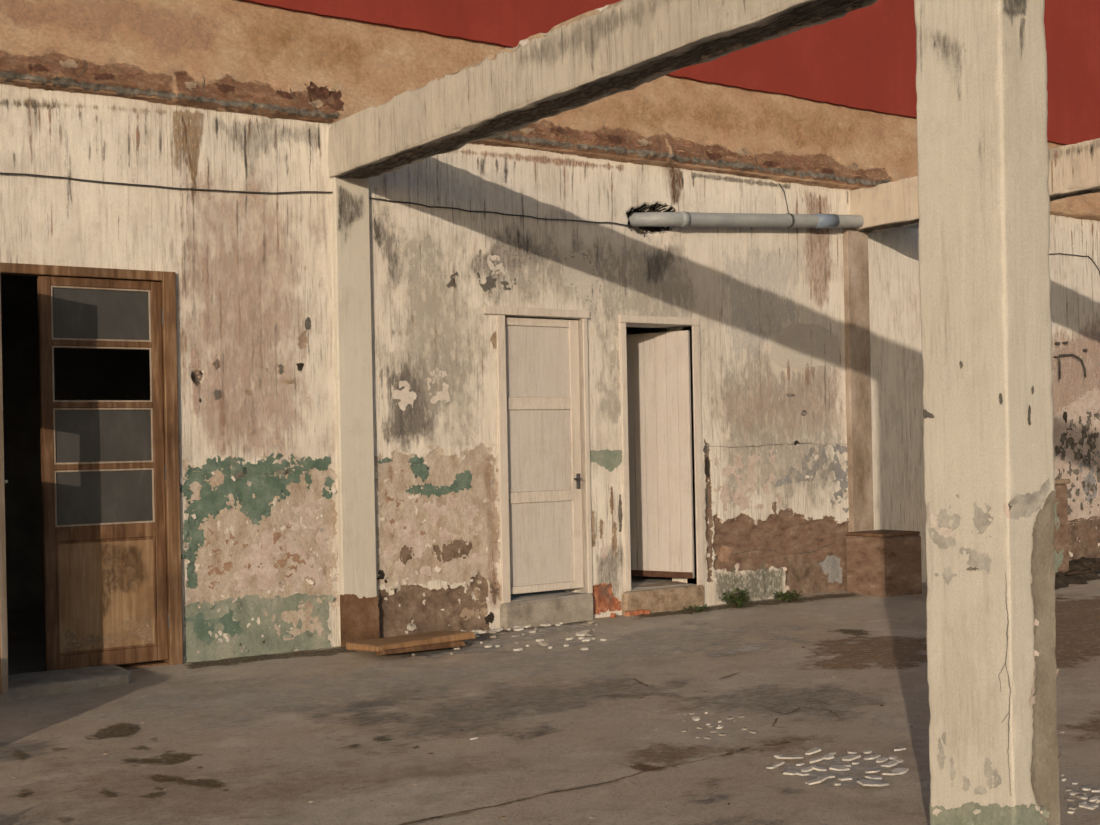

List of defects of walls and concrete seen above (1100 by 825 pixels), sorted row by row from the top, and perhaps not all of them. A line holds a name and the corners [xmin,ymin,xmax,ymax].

spalling [436,0,623,80]
spalling [0,50,344,123]
leakage [0,100,60,156]
leakage [475,219,543,292]
leakage [381,366,450,442]
spalling [180,441,623,663]
spalling [703,439,849,595]
peeling [924,387,1100,825]
peeling [766,747,909,787]